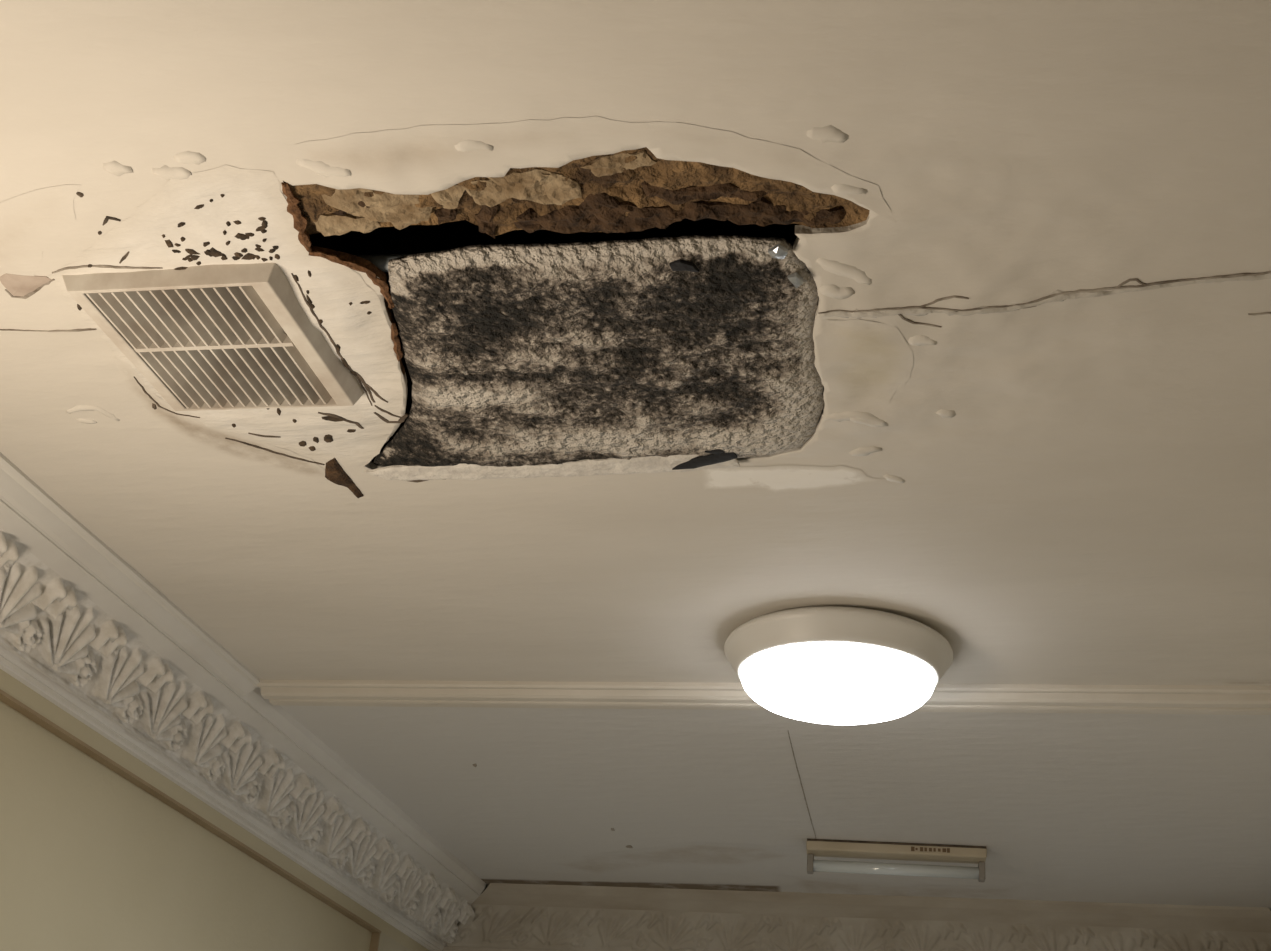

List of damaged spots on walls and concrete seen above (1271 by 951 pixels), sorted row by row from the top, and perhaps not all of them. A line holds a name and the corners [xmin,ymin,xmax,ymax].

peeling [807,125,849,143]
peeling [103,161,134,177]
peeling [152,151,206,181]
flaking render [286,147,869,239]
peeling [0,217,280,299]
peeling [294,270,323,324]
peeling [816,258,872,300]
crack [818,271,1271,328]
peeling [299,416,356,451]
flaking render [325,458,363,498]